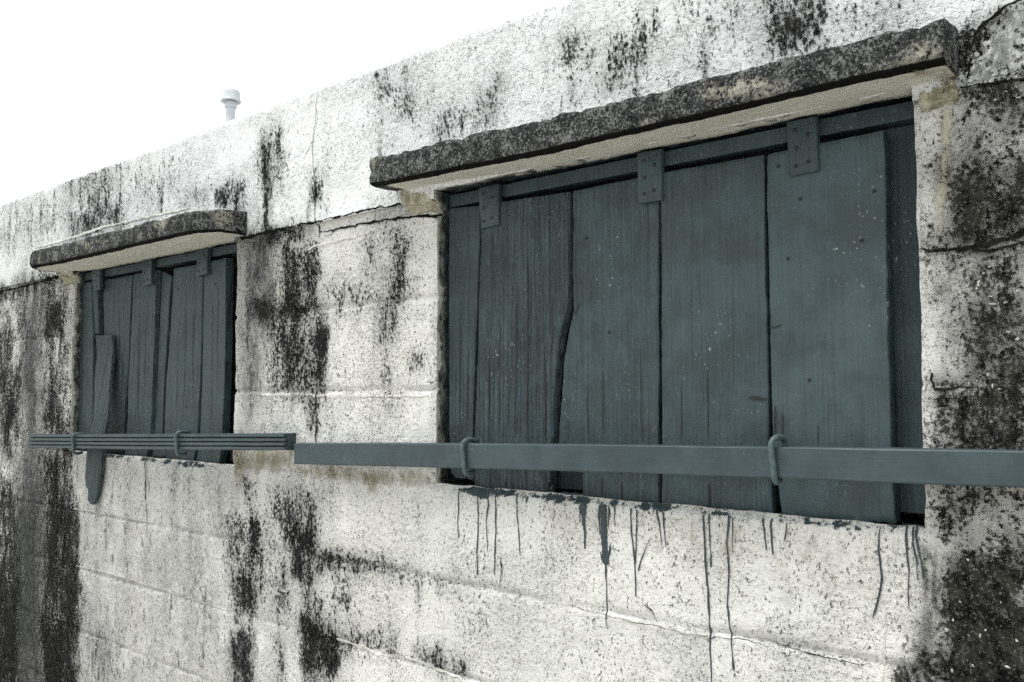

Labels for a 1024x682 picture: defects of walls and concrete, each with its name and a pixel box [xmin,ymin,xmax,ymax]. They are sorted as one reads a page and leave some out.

crack [240,96,443,241]
damp [367,52,511,156]
damp [543,0,909,111]
damp [916,1,1024,450]
crack [919,228,1024,253]
damp [0,108,470,682]
crack [930,373,974,391]
damp [885,485,1024,682]